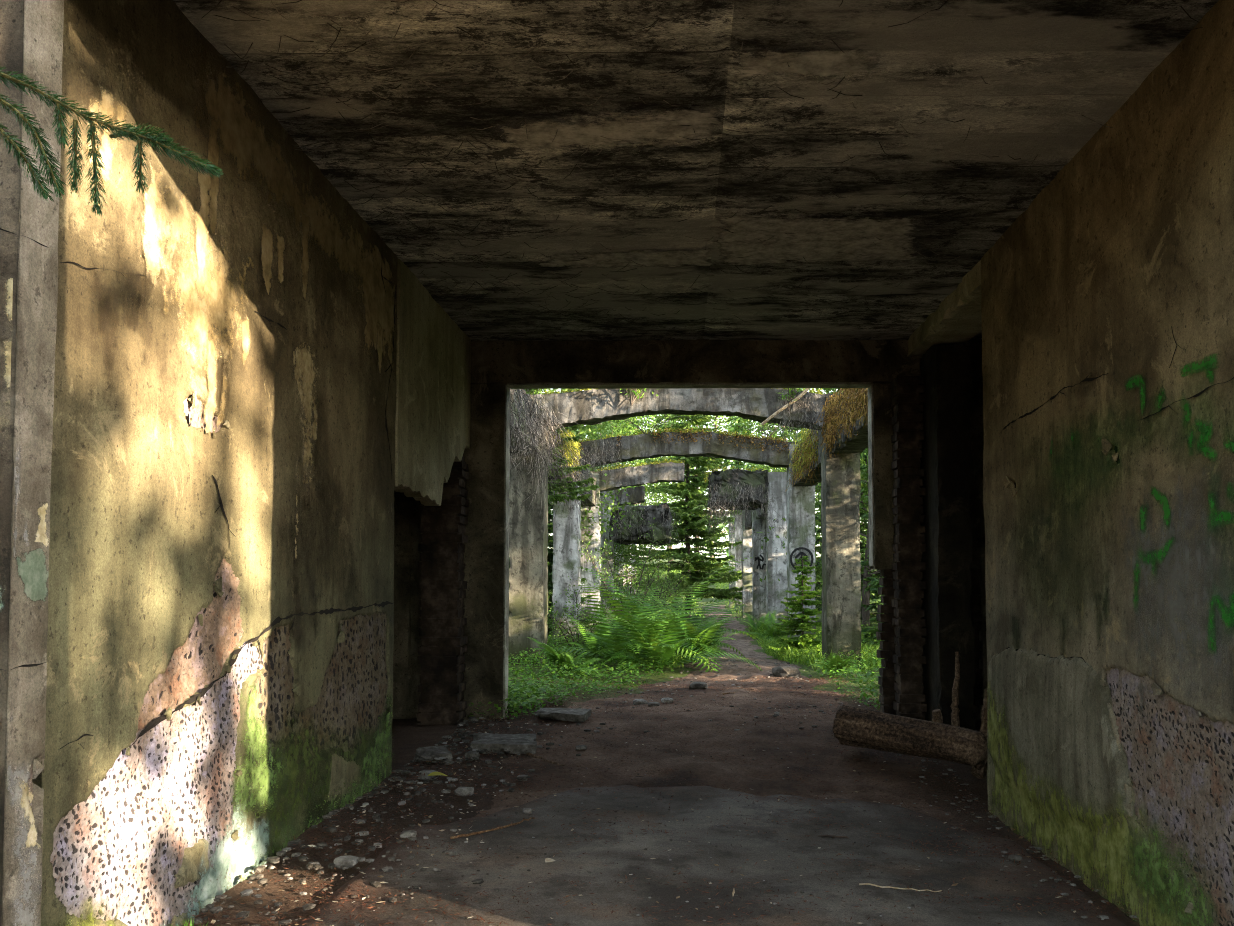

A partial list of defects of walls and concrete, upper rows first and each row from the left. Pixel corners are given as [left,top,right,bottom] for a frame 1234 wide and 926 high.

water stain [88,90,126,188]
water stain [500,109,721,151]
water stain [143,63,397,431]
water stain [538,213,917,268]
peeling [183,392,230,438]
water stain [293,341,320,559]
crack [1003,373,1108,430]
crack [1141,377,1234,420]
crack [212,475,235,545]
peeling [16,531,49,601]
spalling [50,559,388,926]
spalling [1100,668,1234,926]